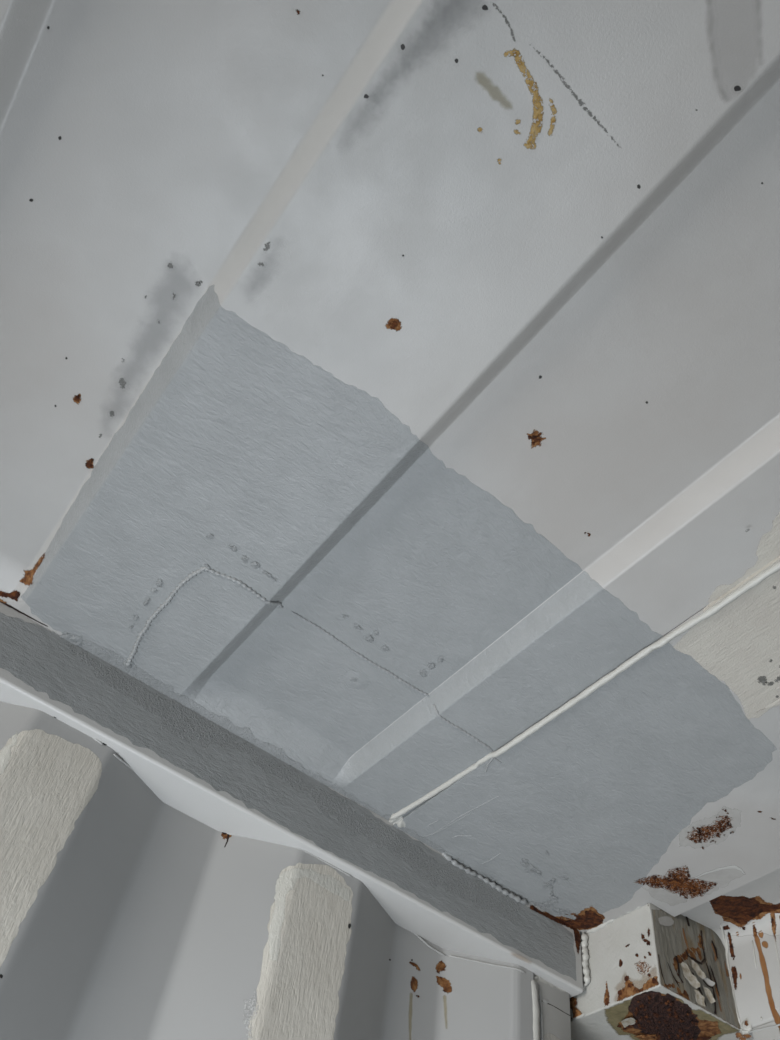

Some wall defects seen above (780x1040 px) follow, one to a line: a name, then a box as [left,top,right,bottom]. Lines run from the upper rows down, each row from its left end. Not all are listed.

corrosion [0,554,45,601]
spalling [757,659,780,698]
corrosion [679,806,742,849]
corrosion [530,905,605,954]
corrosion [636,865,780,1030]
corrosion [604,928,680,1036]
corrosion [692,1011,721,1038]